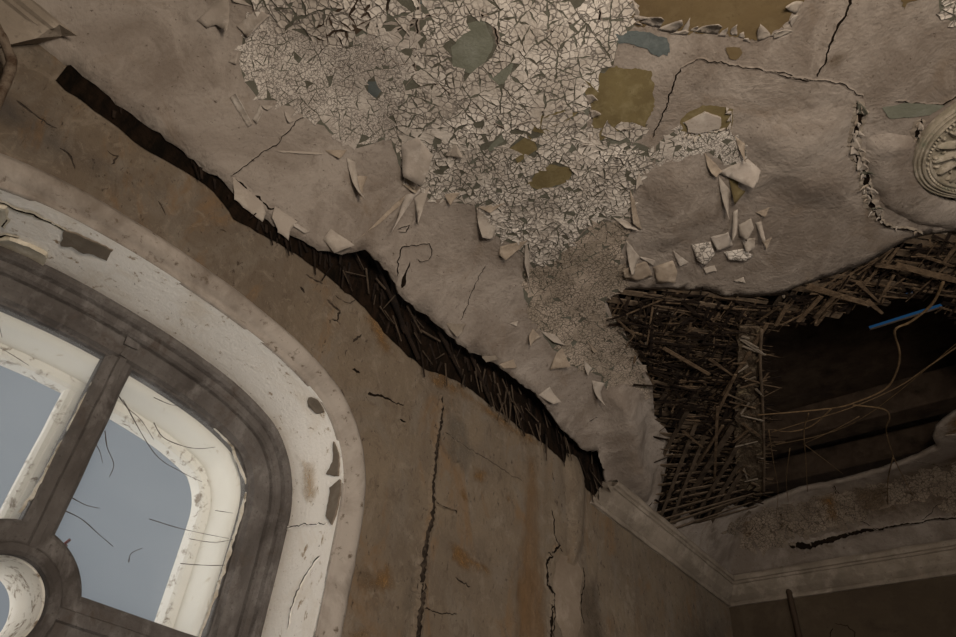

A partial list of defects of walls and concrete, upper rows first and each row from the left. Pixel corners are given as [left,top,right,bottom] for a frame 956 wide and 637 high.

crack [652,0,864,137]
crack [895,95,956,107]
peeling [0,237,48,265]
crack [299,273,362,343]
crack [460,266,486,320]
spalling [56,0,956,529]
crack [352,366,406,424]
crack [410,394,523,637]
crack [787,515,956,555]
crack [543,510,563,637]
spalling [552,553,583,637]
crack [579,566,601,624]